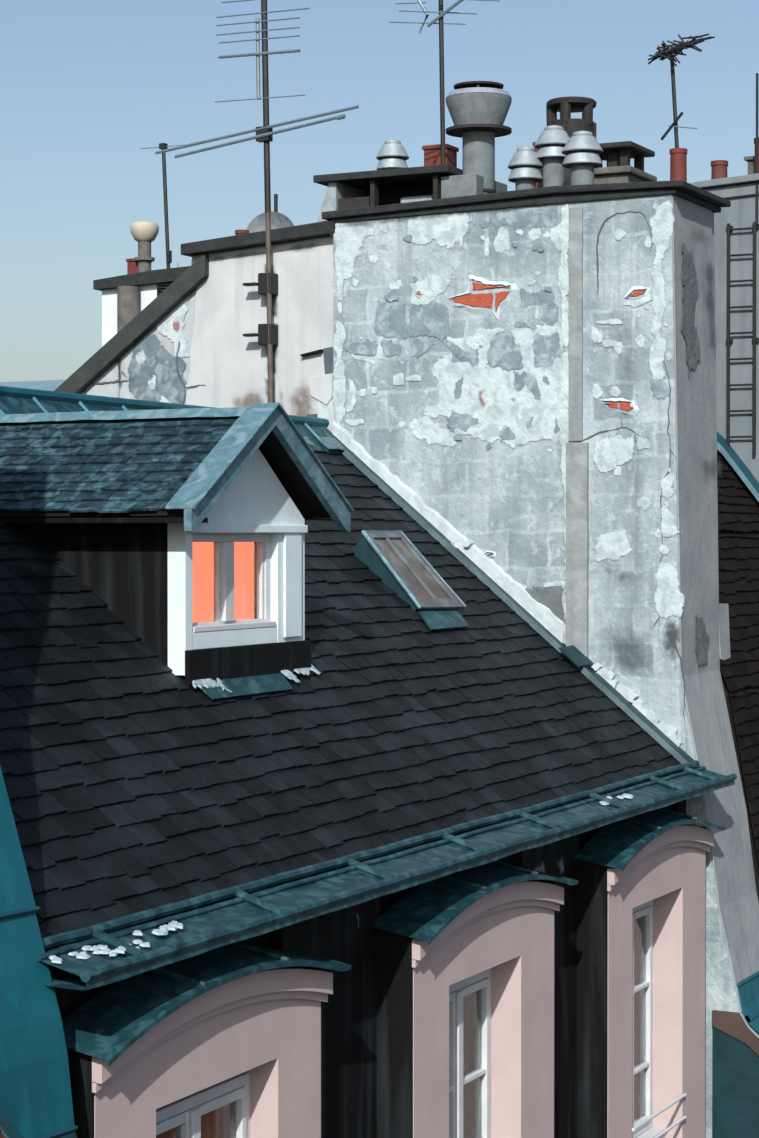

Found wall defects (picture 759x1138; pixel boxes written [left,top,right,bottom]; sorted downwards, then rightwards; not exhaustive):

crack [596,211,653,294]
peeling [591,199,701,399]
flaking render [128,293,192,404]
peeling [304,204,569,620]
peeling [591,383,648,476]
peeling [593,528,637,562]
peeling [636,468,680,555]
peeling [695,615,710,666]